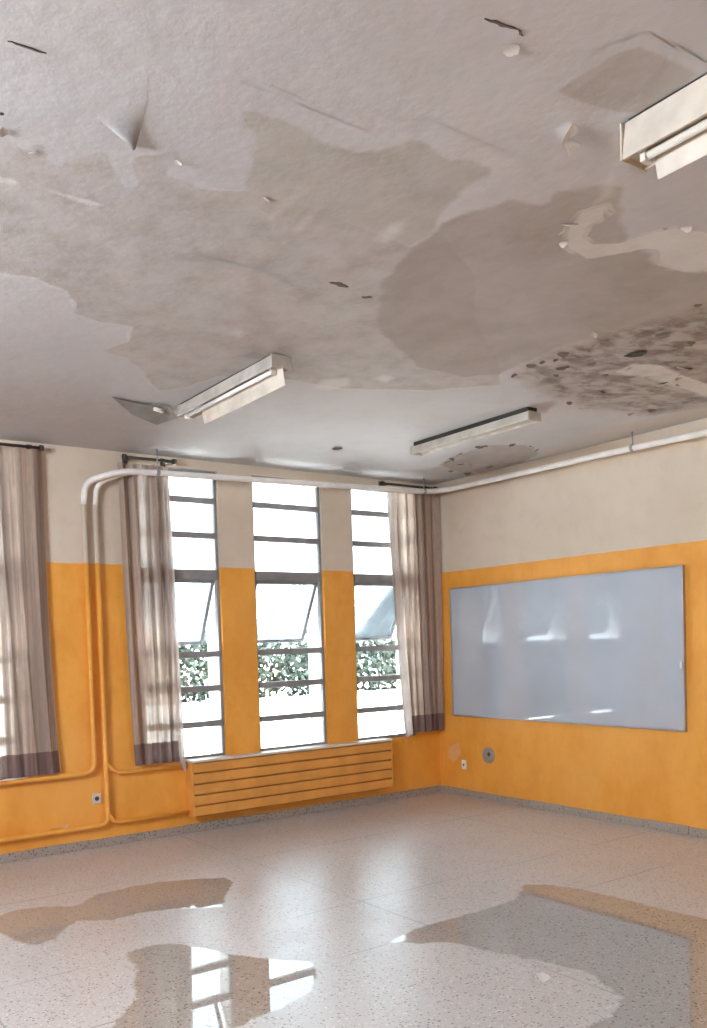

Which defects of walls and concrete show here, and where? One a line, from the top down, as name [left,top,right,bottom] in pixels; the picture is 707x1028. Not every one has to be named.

peeling [0,32,707,421]